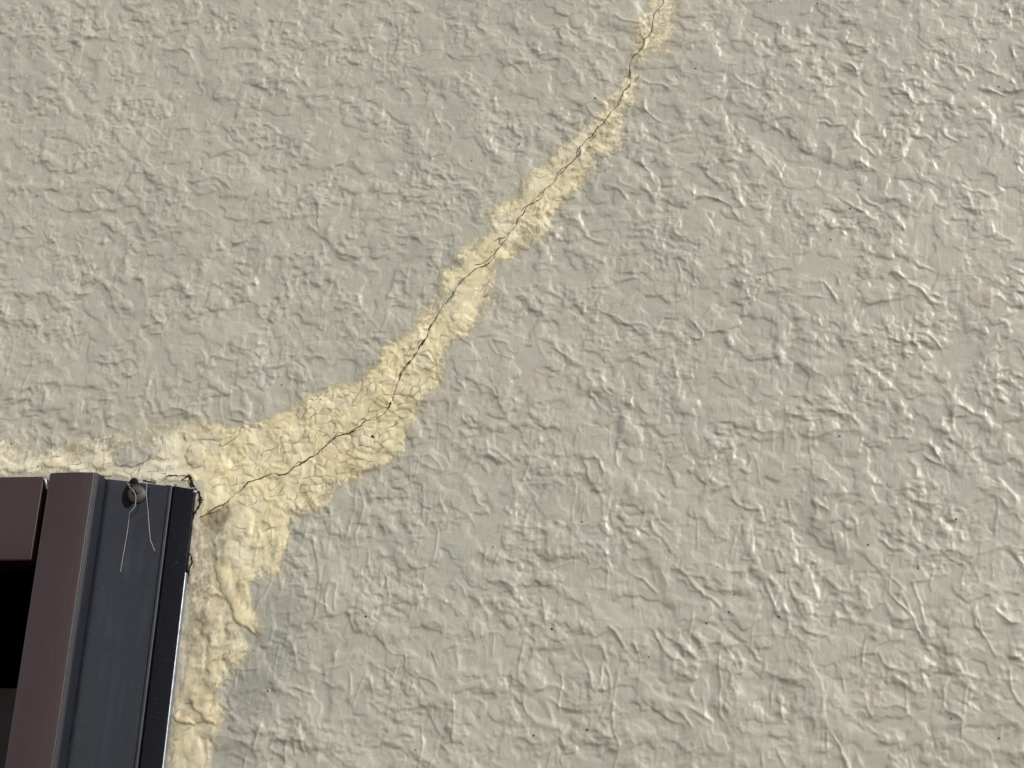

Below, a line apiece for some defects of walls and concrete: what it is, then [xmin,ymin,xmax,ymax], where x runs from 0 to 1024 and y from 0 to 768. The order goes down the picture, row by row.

crack [56,0,664,551]